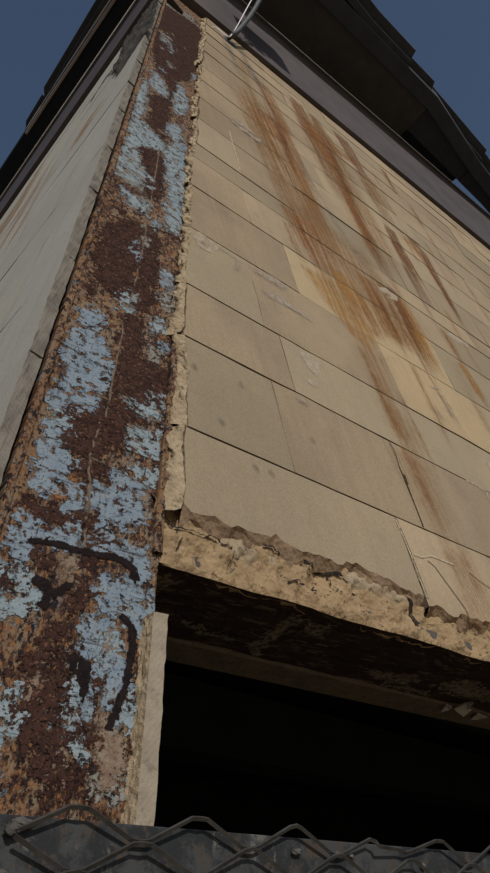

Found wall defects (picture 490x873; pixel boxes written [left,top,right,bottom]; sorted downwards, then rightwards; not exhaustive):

spalling [91,0,160,101]
corrosion [136,3,200,205]
corrosion [244,79,455,360]
spalling [113,2,490,664]
corrosion [0,201,181,814]
peeling [0,303,185,768]
crack [389,441,490,624]
peeling [0,680,31,793]
peeling [85,768,127,812]
peeling [364,668,490,720]